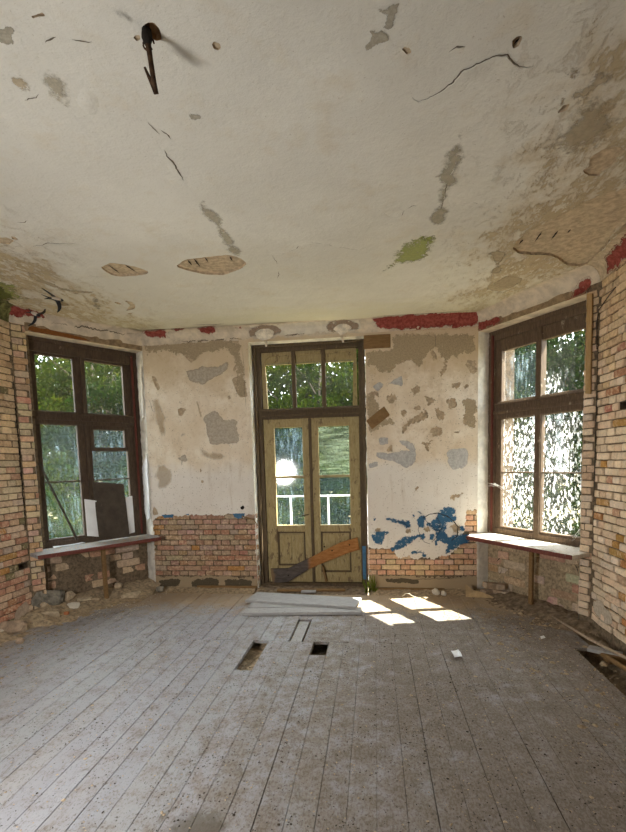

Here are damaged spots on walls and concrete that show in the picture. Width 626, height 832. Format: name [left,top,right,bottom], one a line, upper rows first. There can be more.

crack [404,46,533,113]
peeling [9,305,47,319]
peeling [488,251,521,291]
peeling [565,277,592,301]
peeling [604,234,626,274]
flaking render [138,367,160,424]
peeling [142,326,247,399]
peeling [365,312,504,470]
spalling [142,454,260,581]
spalling [367,493,477,578]